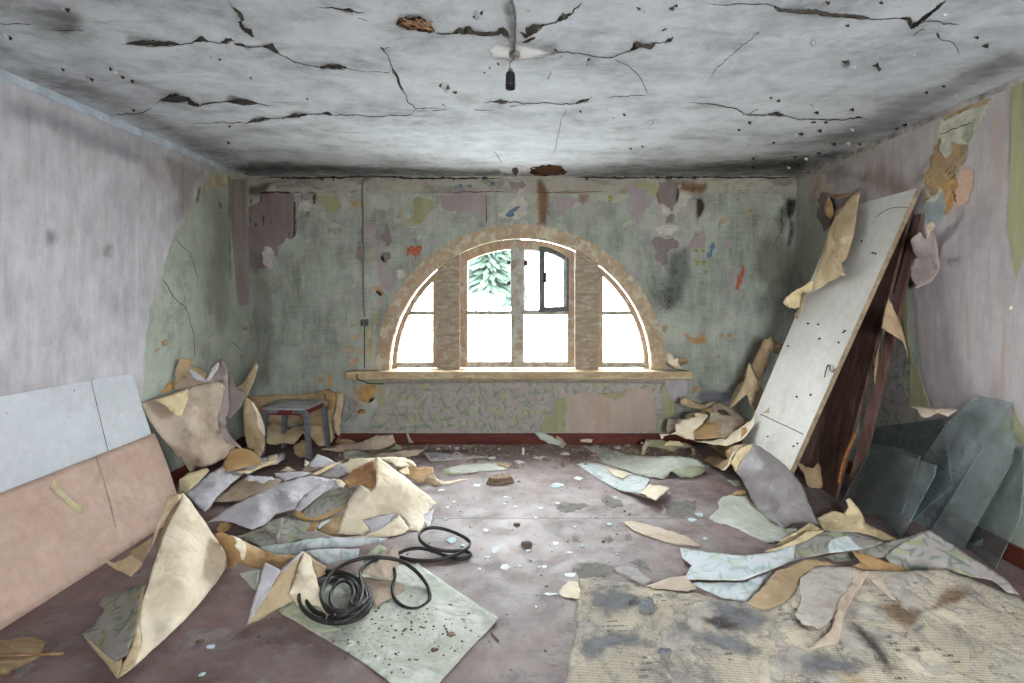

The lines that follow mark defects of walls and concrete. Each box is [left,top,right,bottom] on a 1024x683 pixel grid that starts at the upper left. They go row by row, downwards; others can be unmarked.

crack [118,2,445,124]
flaking render [483,43,563,73]
crack [437,3,673,153]
crack [710,1,959,77]
crack [692,102,866,124]
flaking render [498,188,540,222]
corrosion [538,181,547,223]
flaking render [655,185,691,236]
leakage [780,199,796,242]
flaking render [262,246,275,269]
leakage [659,252,688,303]
peeling [565,387,656,433]